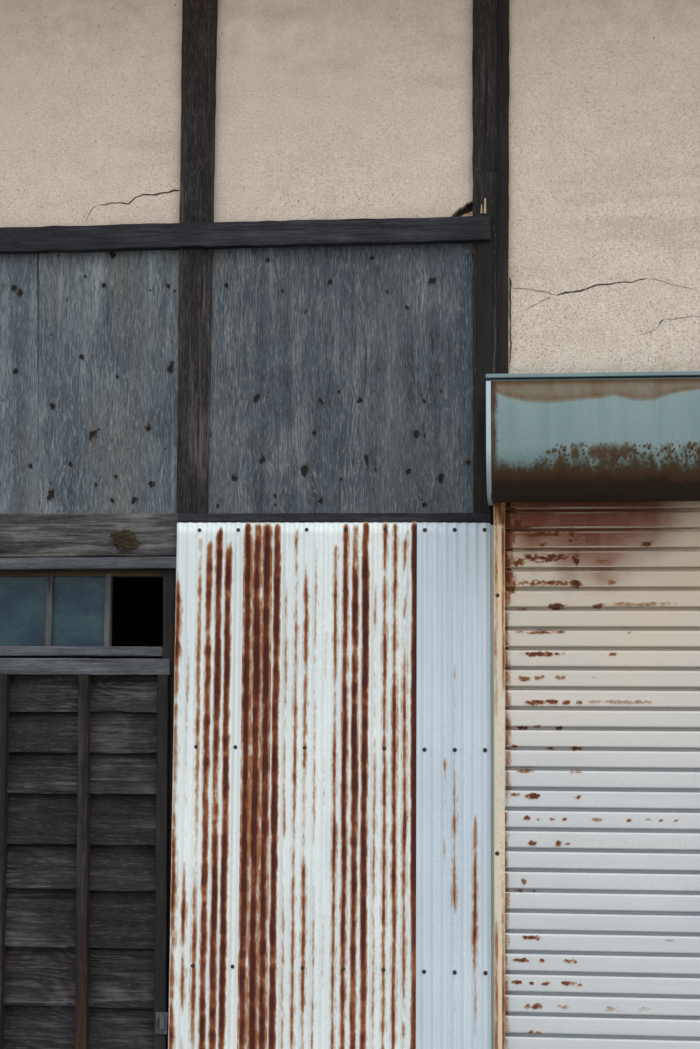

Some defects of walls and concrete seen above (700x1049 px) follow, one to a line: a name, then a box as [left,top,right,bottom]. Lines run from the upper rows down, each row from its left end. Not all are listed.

crack [87,189,180,219]
crack [509,278,700,360]
rust [491,442,700,799]
rust [169,522,317,1049]
rust [331,521,417,1049]
rust [444,760,457,909]
rust [494,810,582,1049]